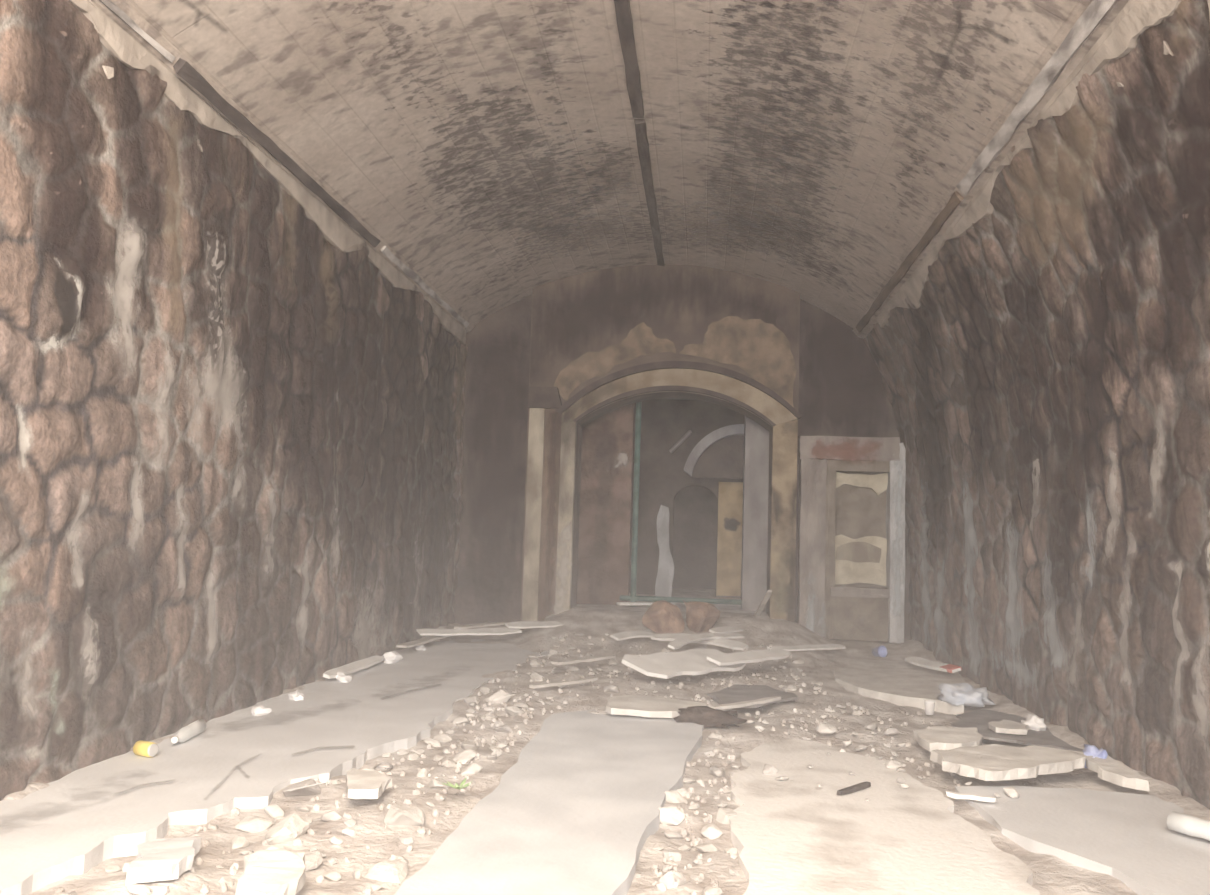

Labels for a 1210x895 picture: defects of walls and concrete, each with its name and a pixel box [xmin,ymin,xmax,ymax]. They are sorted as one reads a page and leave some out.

spalling [55,273,77,338]
water stain [29,0,160,365]
flaking render [69,0,466,344]
water stain [409,54,637,244]
flaking render [554,316,797,408]
water stain [698,0,871,259]
flaking render [876,0,1183,328]